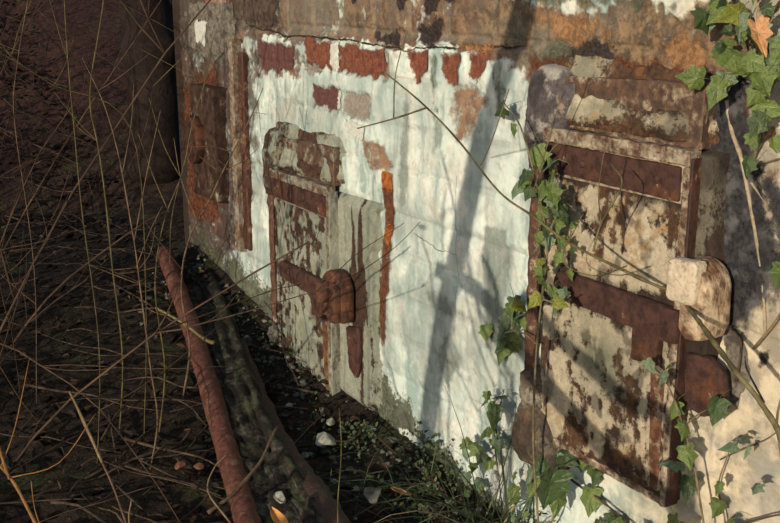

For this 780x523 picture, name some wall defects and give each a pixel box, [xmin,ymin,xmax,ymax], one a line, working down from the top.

flaking render [188,1,237,64]
peeling [257,36,386,81]
crack [246,23,527,56]
peeling [406,48,428,84]
corrosion [528,54,562,71]
corrosion [539,0,607,48]
corrosion [615,35,713,77]
peeling [441,49,490,140]
flaking render [313,83,393,170]
corrosion [378,171,395,345]